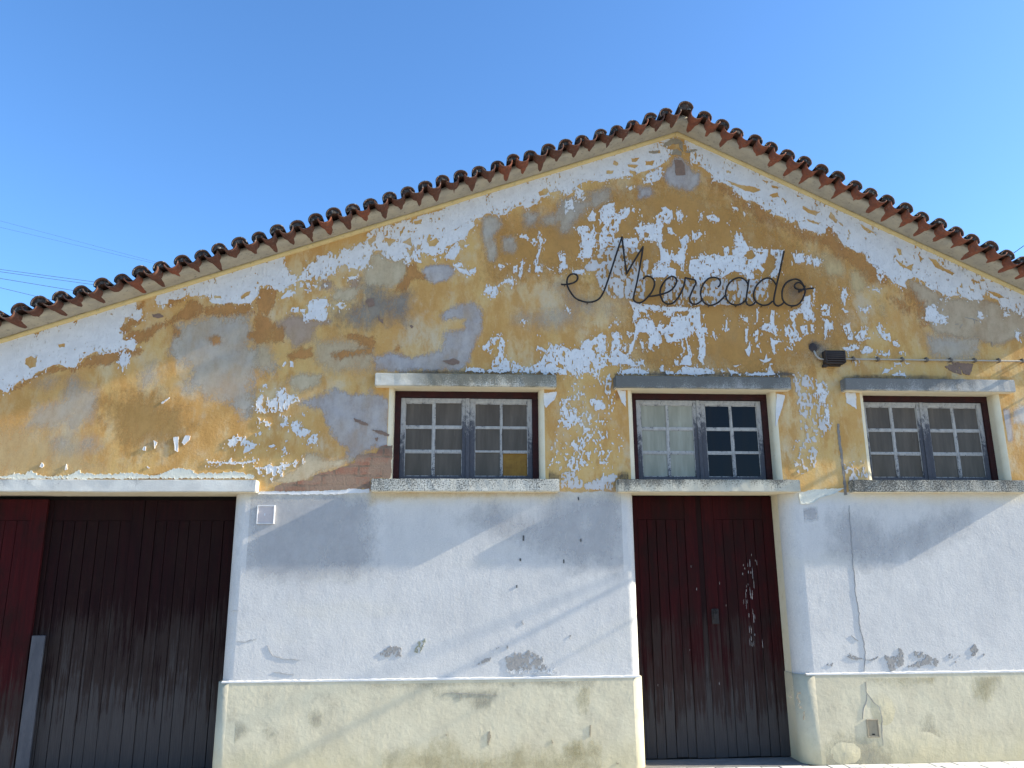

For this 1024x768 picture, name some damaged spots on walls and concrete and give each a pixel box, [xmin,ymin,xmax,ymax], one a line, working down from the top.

peeling [0,137,1024,492]
crack [837,424,883,740]
flaking render [380,639,425,657]
flaking render [478,646,546,671]
flaking render [847,644,985,672]